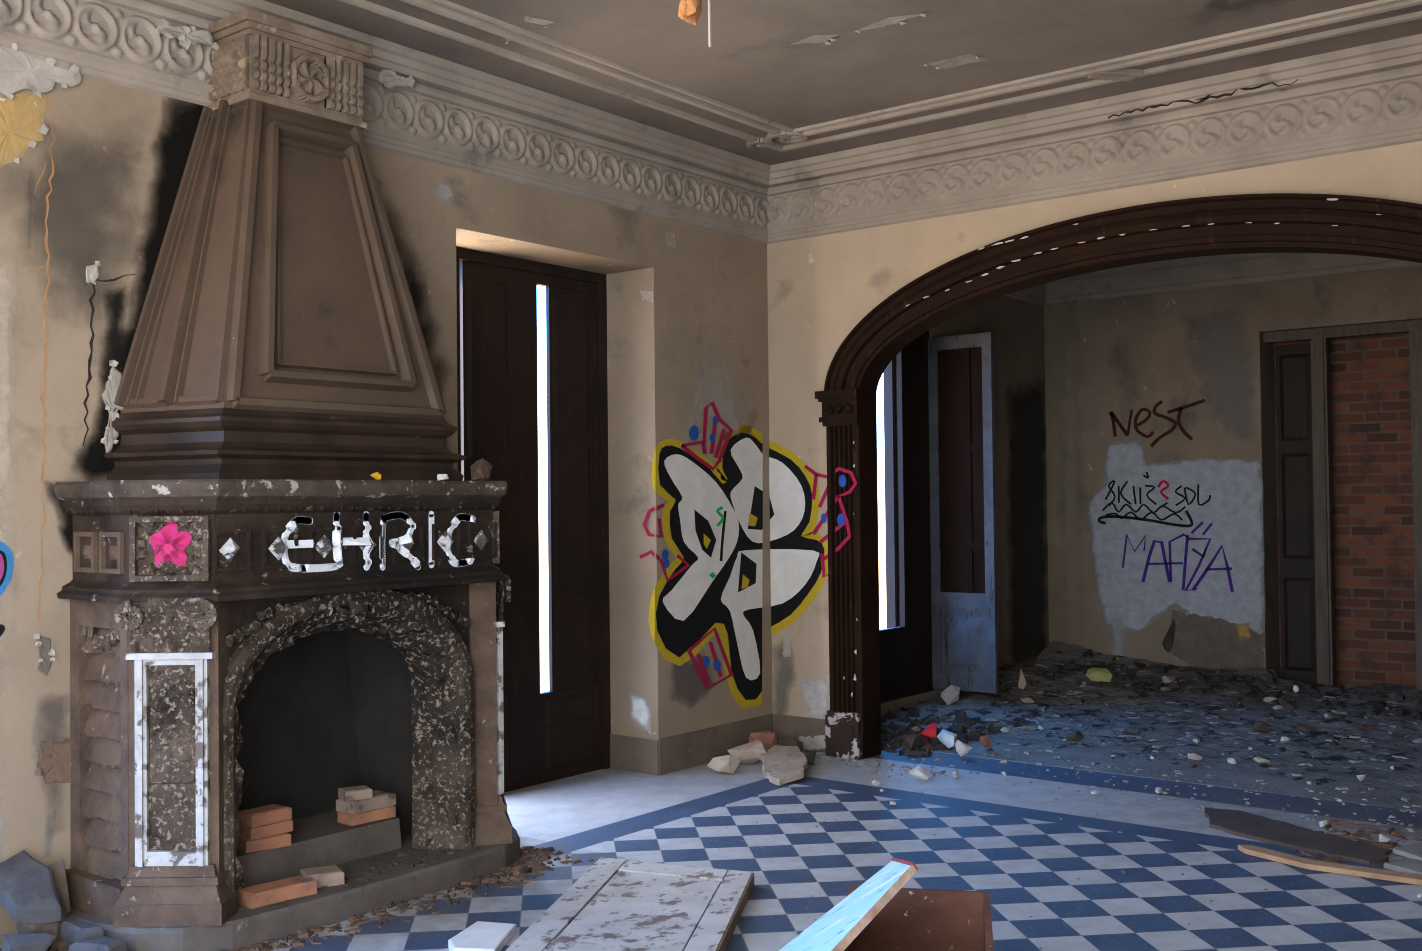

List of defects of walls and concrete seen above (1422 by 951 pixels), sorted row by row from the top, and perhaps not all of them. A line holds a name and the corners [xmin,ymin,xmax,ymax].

crack [1108,79,1298,119]
flaking render [1170,610,1266,669]